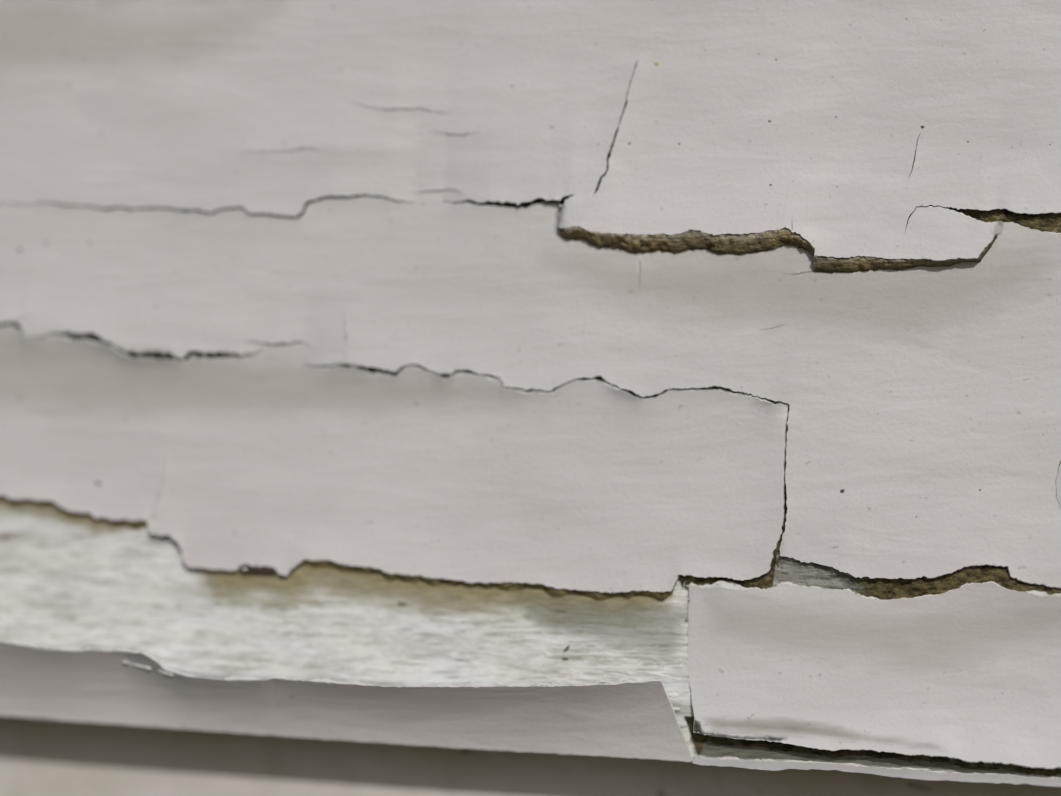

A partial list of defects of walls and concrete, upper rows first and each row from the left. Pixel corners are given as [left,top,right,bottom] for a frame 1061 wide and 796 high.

crack [1,60,638,218]
peeling [558,53,1002,274]
crack [0,318,1061,600]
peeling [0,325,1061,787]